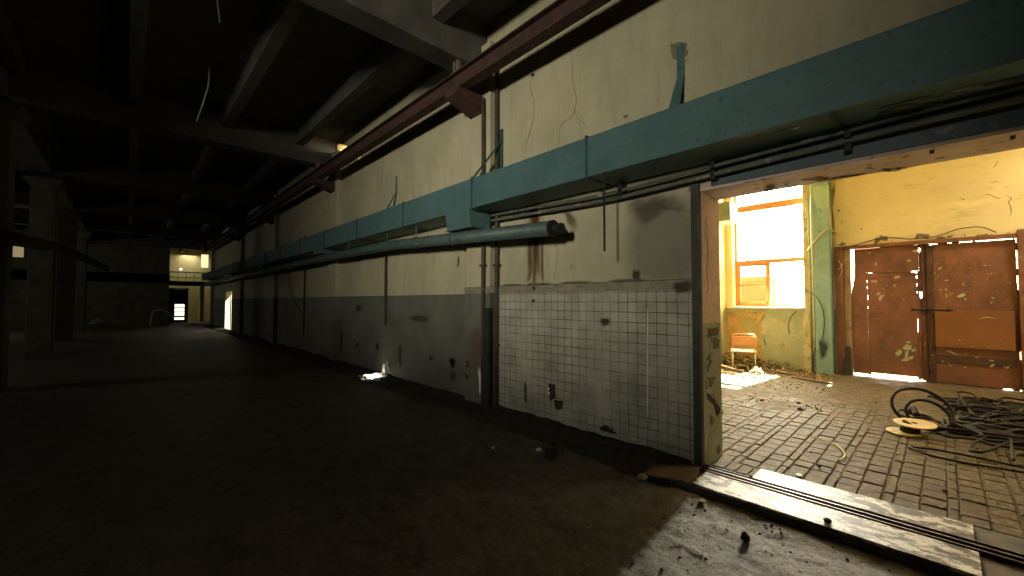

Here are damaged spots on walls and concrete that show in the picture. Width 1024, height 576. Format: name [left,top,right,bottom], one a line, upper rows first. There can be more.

rust [528,237,544,283]
flaking render [706,309,789,426]
peeling [547,383,563,411]